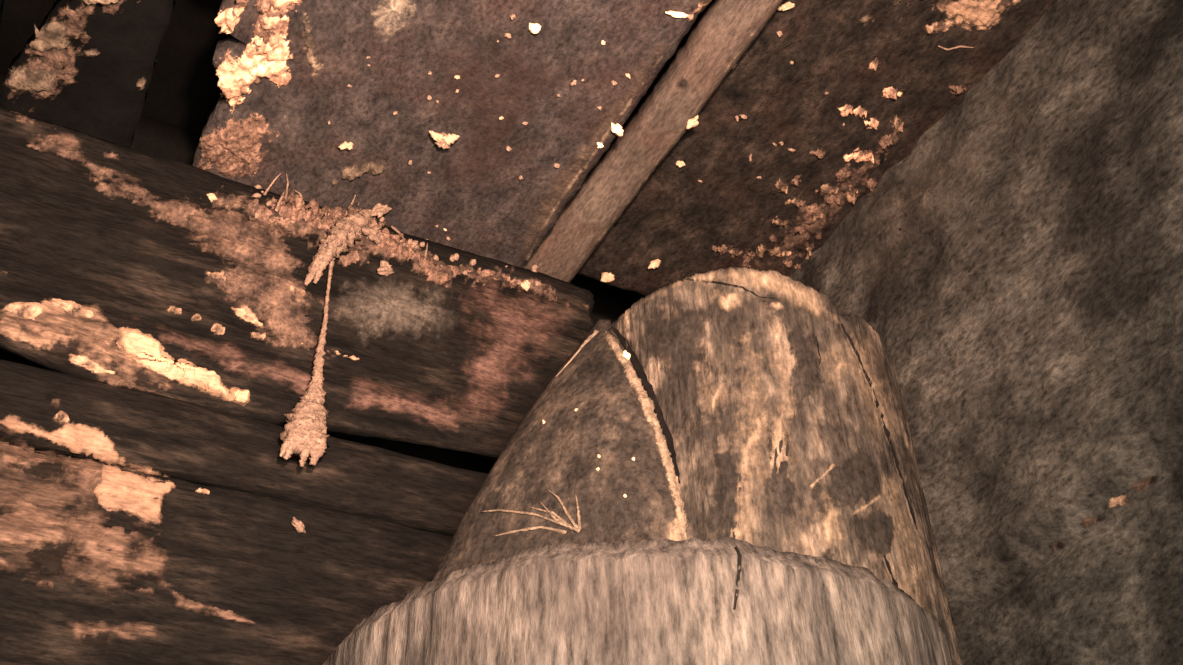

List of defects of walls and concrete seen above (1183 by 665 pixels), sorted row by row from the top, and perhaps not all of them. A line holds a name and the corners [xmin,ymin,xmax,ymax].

peeling [0,298,250,405]
crack [556,326,688,539]
peeling [0,399,253,623]
crack [733,546,742,610]
peeling [74,623,156,644]